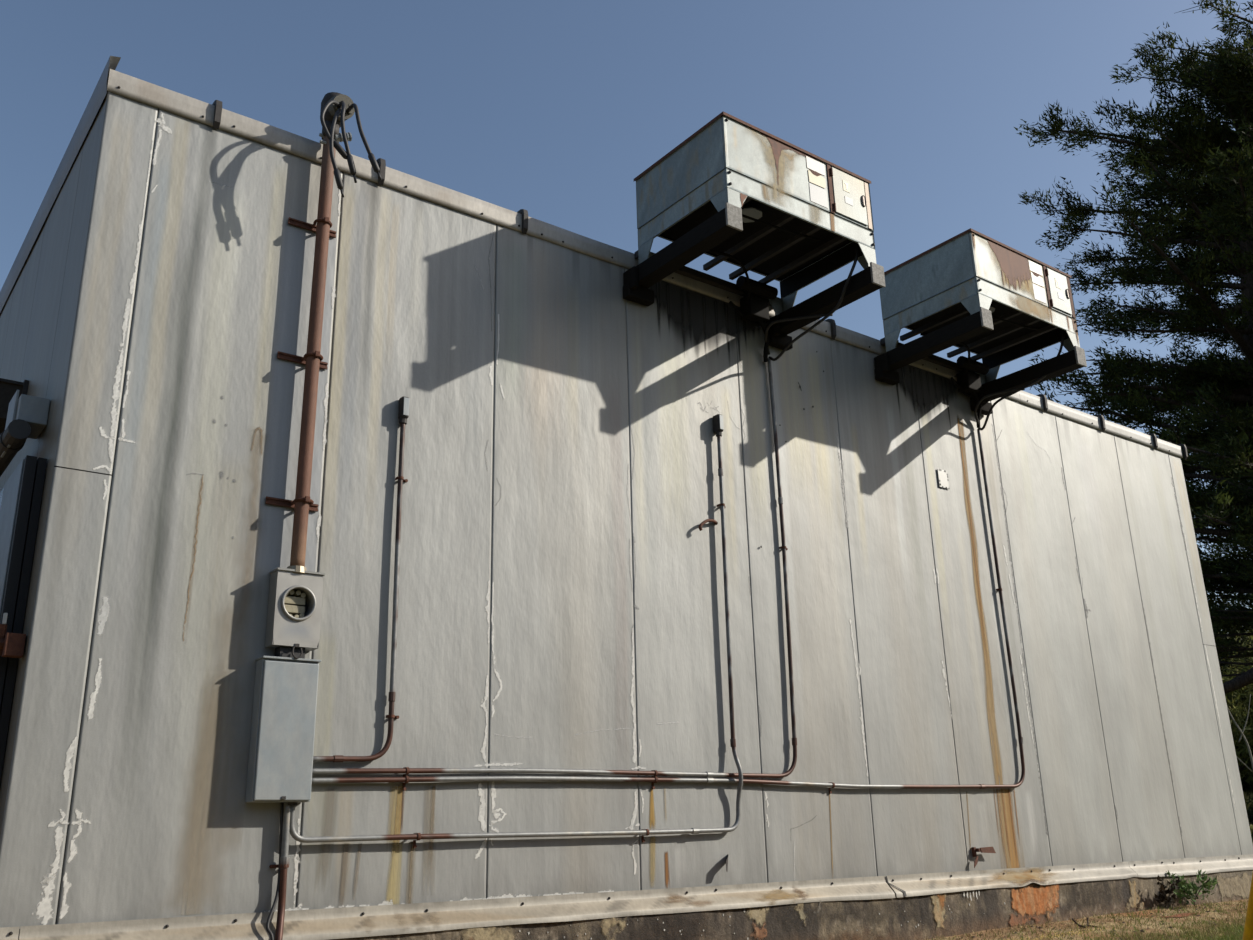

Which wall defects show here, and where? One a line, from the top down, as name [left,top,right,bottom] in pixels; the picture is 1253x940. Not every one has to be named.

corrosion [757,130,836,232]
corrosion [972,232,1079,343]
corrosion [958,419,1059,927]
corrosion [387,786,435,905]